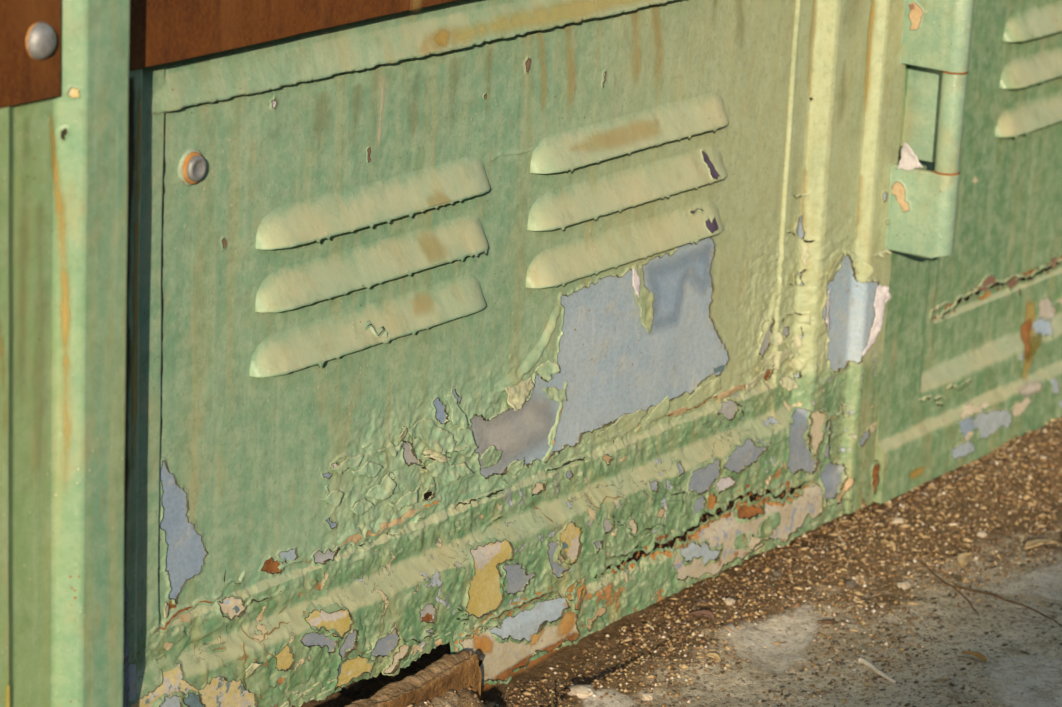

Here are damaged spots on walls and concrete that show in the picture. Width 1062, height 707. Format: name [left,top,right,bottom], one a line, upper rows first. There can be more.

corrosion [0,0,61,109]
corrosion [866,0,874,97]
corrosion [124,0,457,587]
peeling [320,206,740,532]
peeling [755,248,892,391]
corrosion [1021,303,1042,378]
peeling [159,455,208,619]
peeling [123,587,259,707]
peeling [272,601,412,692]
peeling [461,537,537,623]
corrosion [457,578,588,692]
corrosion [670,482,826,585]